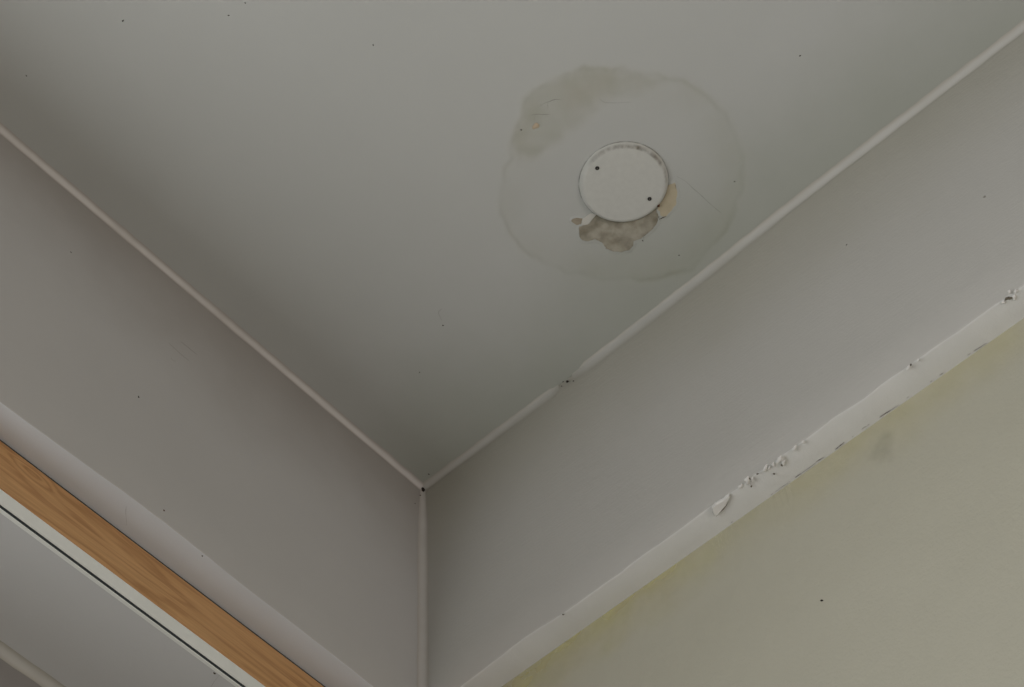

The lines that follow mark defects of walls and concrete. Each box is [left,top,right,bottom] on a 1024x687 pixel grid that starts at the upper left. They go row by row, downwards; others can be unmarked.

peeling [568,180,680,255]